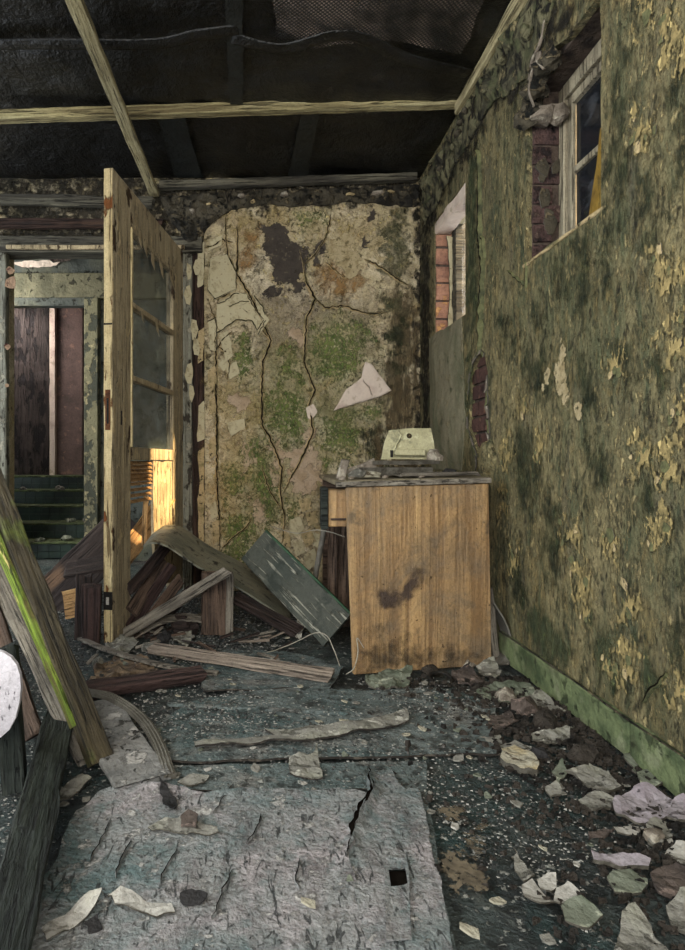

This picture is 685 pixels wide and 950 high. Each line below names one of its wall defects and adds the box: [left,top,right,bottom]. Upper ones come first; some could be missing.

damp [494,80,528,115]
damp [539,3,574,51]
damp [0,176,104,196]
damp [0,206,104,236]
damp [122,119,485,467]
spalling [160,0,570,570]
crack [364,259,408,285]
flaking render [635,226,685,373]
crack [205,214,387,551]
flaking render [541,338,582,420]
flaking render [625,391,685,552]
flaking render [592,528,645,694]